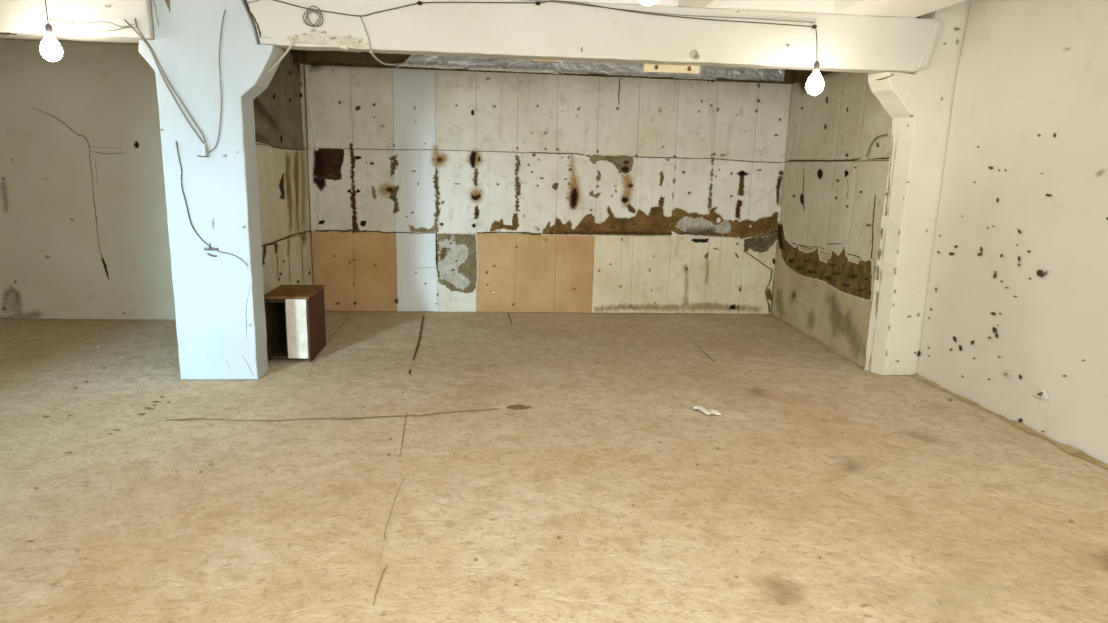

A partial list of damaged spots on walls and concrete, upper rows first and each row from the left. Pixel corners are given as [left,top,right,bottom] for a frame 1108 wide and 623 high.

crack [35,108,126,280]
corrosion [285,150,299,232]
flaking render [255,135,346,191]
corrosion [347,143,366,233]
corrosion [434,147,446,165]
spalling [370,148,572,294]
corrosion [469,151,481,168]
corrosion [568,160,580,209]
corrosion [622,168,636,213]
spalling [535,146,873,301]
corrosion [730,170,749,219]